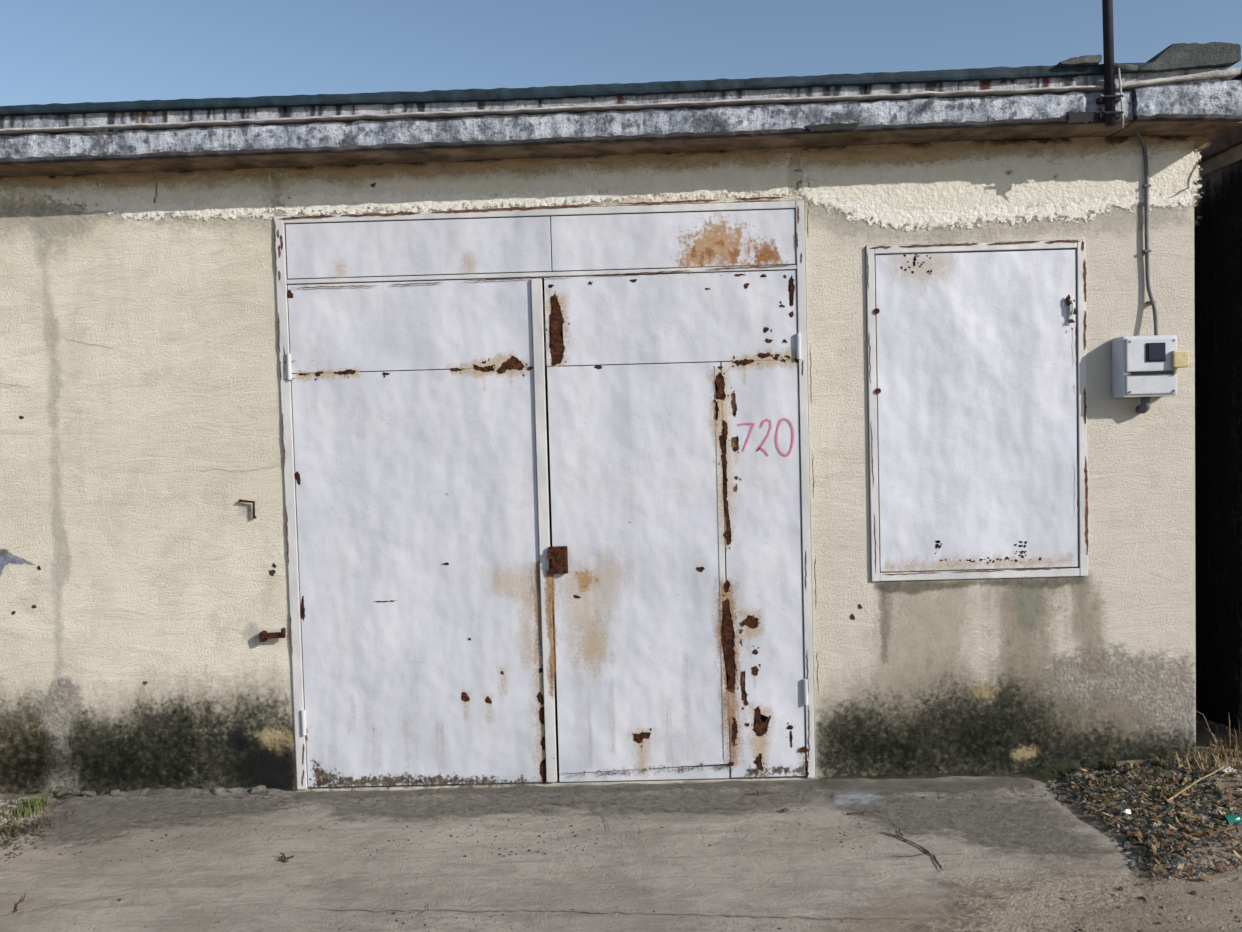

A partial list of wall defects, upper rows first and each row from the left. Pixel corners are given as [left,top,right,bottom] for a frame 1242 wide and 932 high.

peeling [0,144,1202,231]
rust [274,204,597,298]
rust [588,203,809,317]
rust [450,351,532,377]
rust [468,276,570,367]
rust [714,327,812,549]
water stain [34,160,1242,864]
rust [874,513,1062,575]
rust [531,562,556,782]
rust [717,580,771,772]
water stain [0,701,64,794]
water stain [925,870,1162,932]